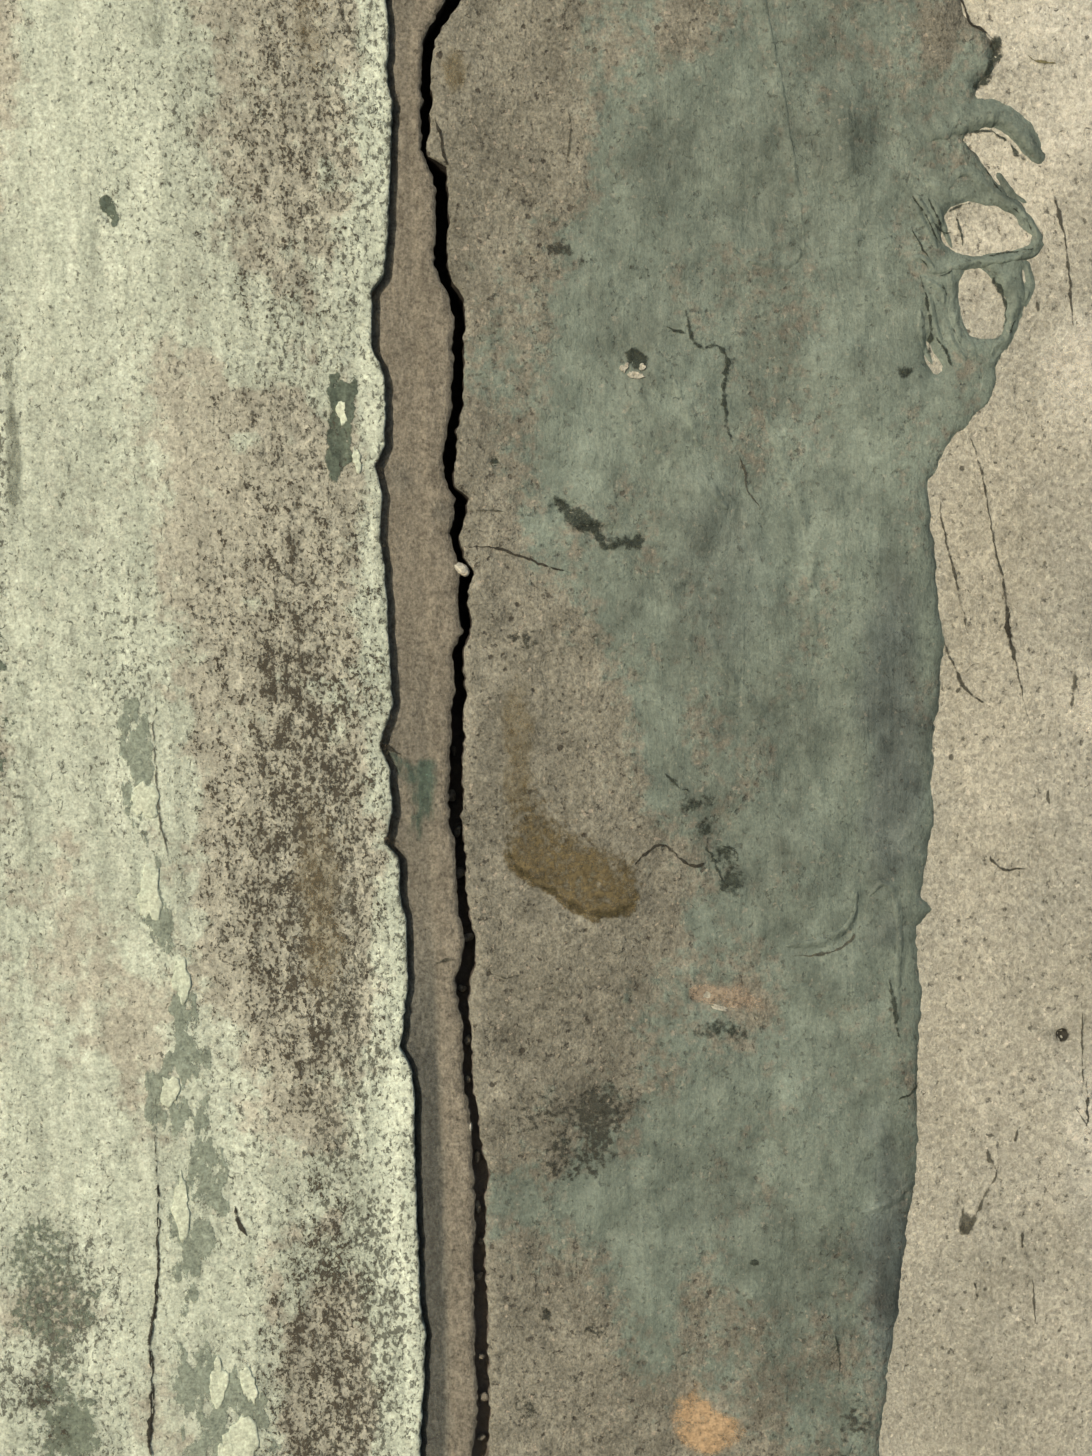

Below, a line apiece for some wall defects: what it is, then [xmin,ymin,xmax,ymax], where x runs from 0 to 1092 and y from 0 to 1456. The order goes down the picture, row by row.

spalling [973,36,1002,89]
spalling [619,348,647,379]
spalling [548,497,644,550]
spalling [455,562,470,577]
crack [420,0,564,1456]
leakage [504,784,640,922]
spalling [665,774,743,896]
spalling [690,985,753,1038]
crack [147,1098,161,1456]